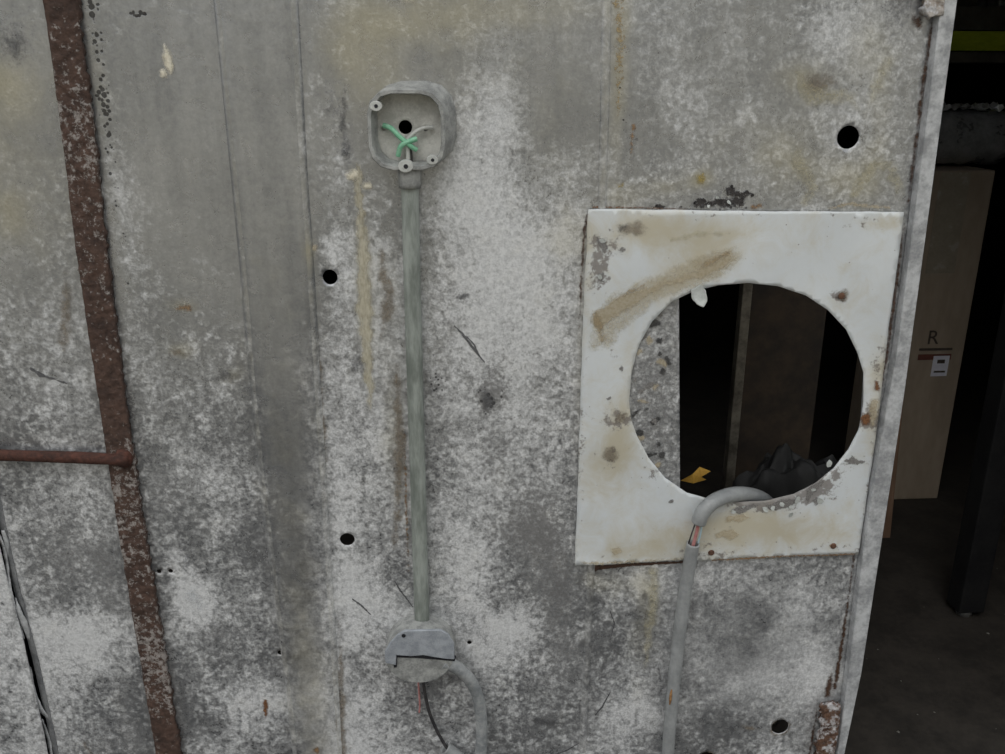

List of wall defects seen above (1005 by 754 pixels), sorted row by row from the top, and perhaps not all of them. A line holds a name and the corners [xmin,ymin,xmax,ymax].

peeling [679,185,754,208]
rust [43,0,184,754]
peeling [731,479,824,517]